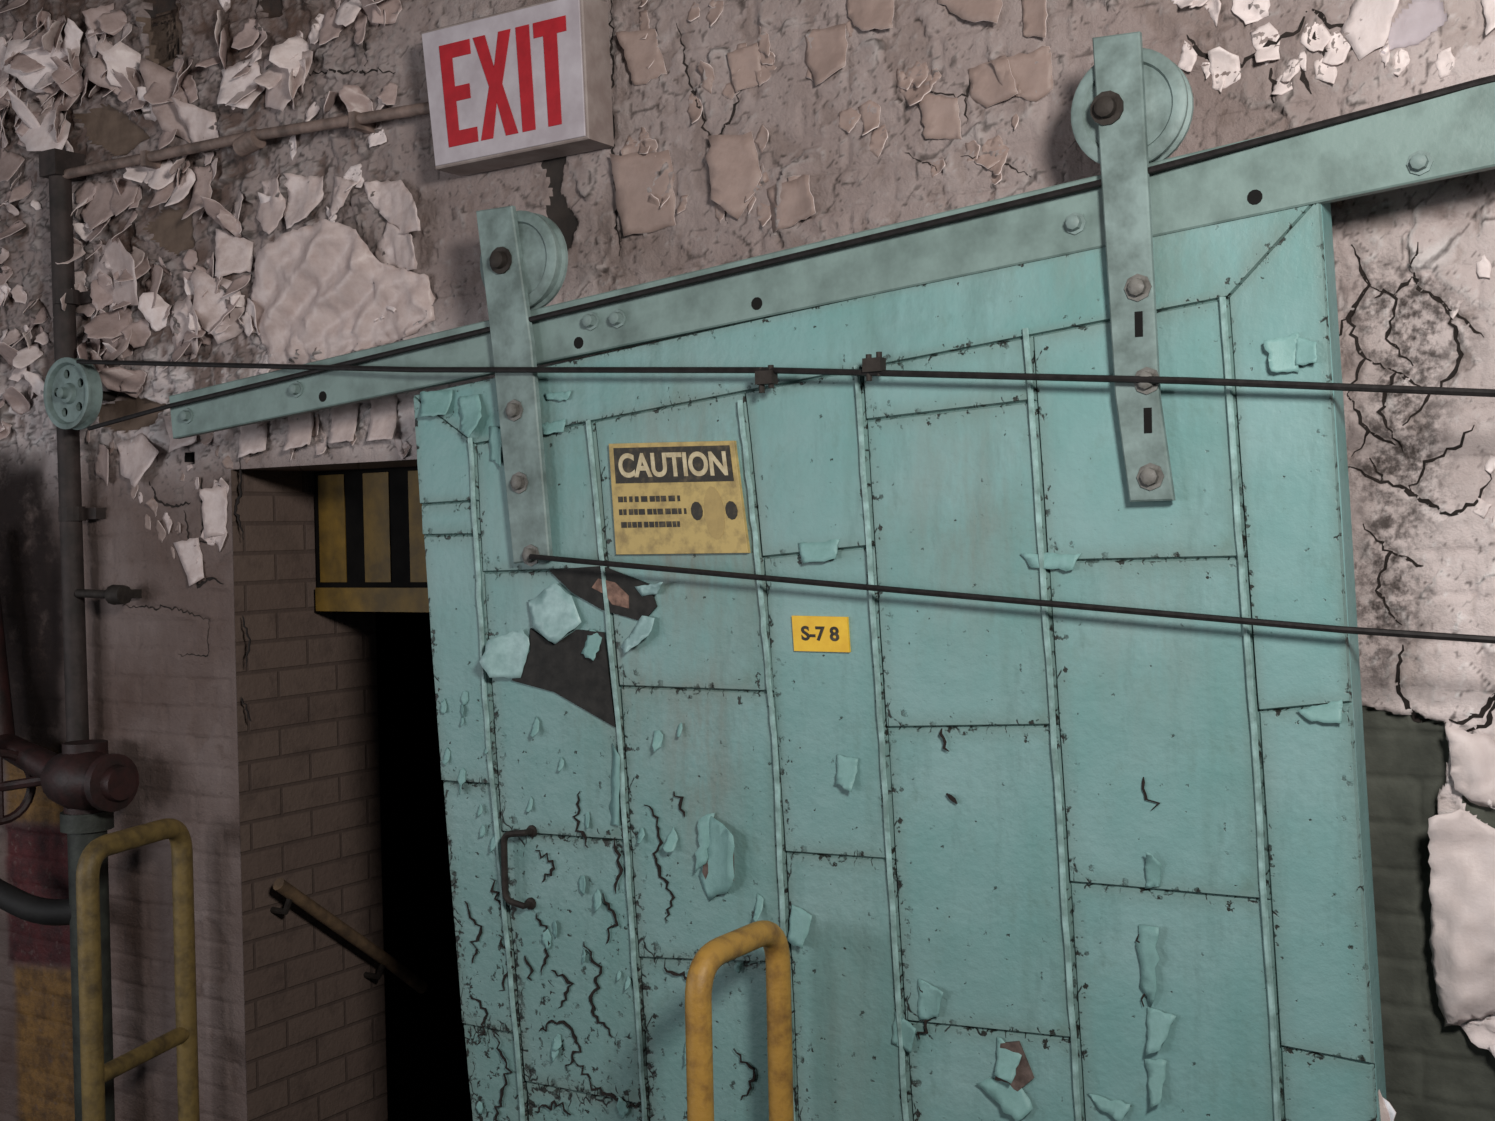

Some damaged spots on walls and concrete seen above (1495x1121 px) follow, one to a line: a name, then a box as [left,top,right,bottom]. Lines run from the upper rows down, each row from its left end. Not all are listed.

peeling [0,0,435,586]
peeling [1264,332,1317,373]
crack [1339,242,1492,516]
peeling [581,628,602,661]
crack [1363,524,1495,732]
crack [946,793,958,804]
crack [1142,777,1160,810]
peeling [695,813,735,901]
crack [464,791,687,1121]
peeling [1362,705,1495,1121]
crack [733,1048,756,1100]
peeling [976,1036,1034,1121]